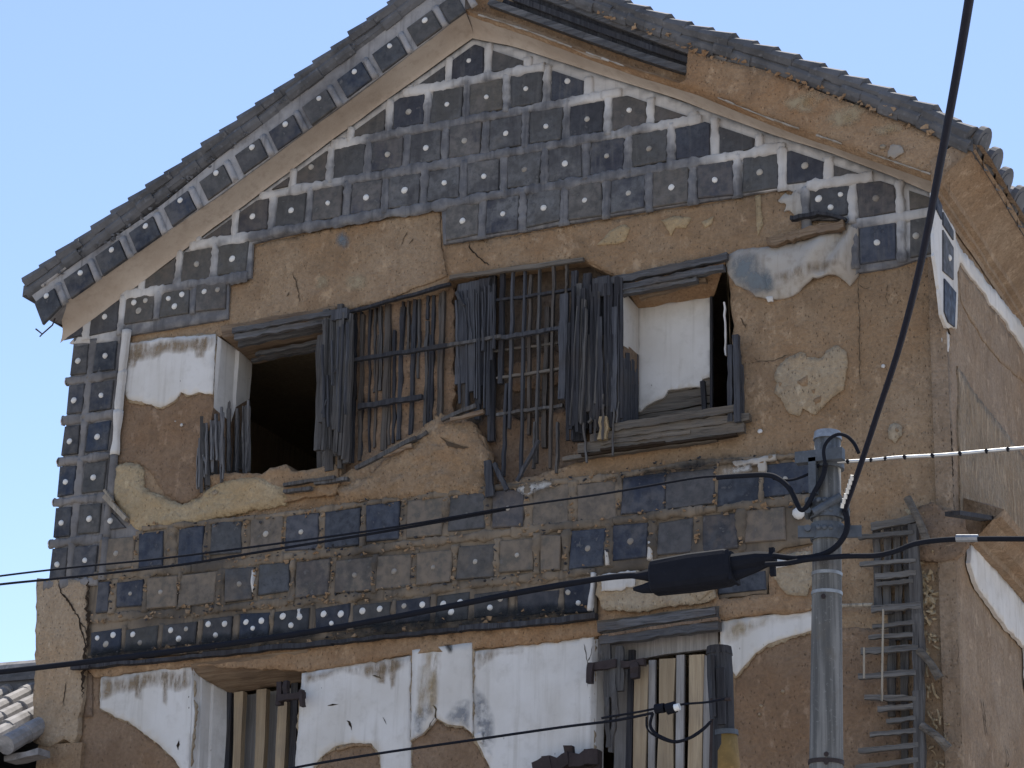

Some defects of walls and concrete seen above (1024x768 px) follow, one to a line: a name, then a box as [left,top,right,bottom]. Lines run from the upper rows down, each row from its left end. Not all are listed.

leakage [131,339,206,364]
spalling [774,345,848,416]
flaking render [118,393,214,504]
crack [58,581,91,701]
flaking render [80,671,180,768]
flaking render [316,743,380,768]
flaking render [412,720,489,768]